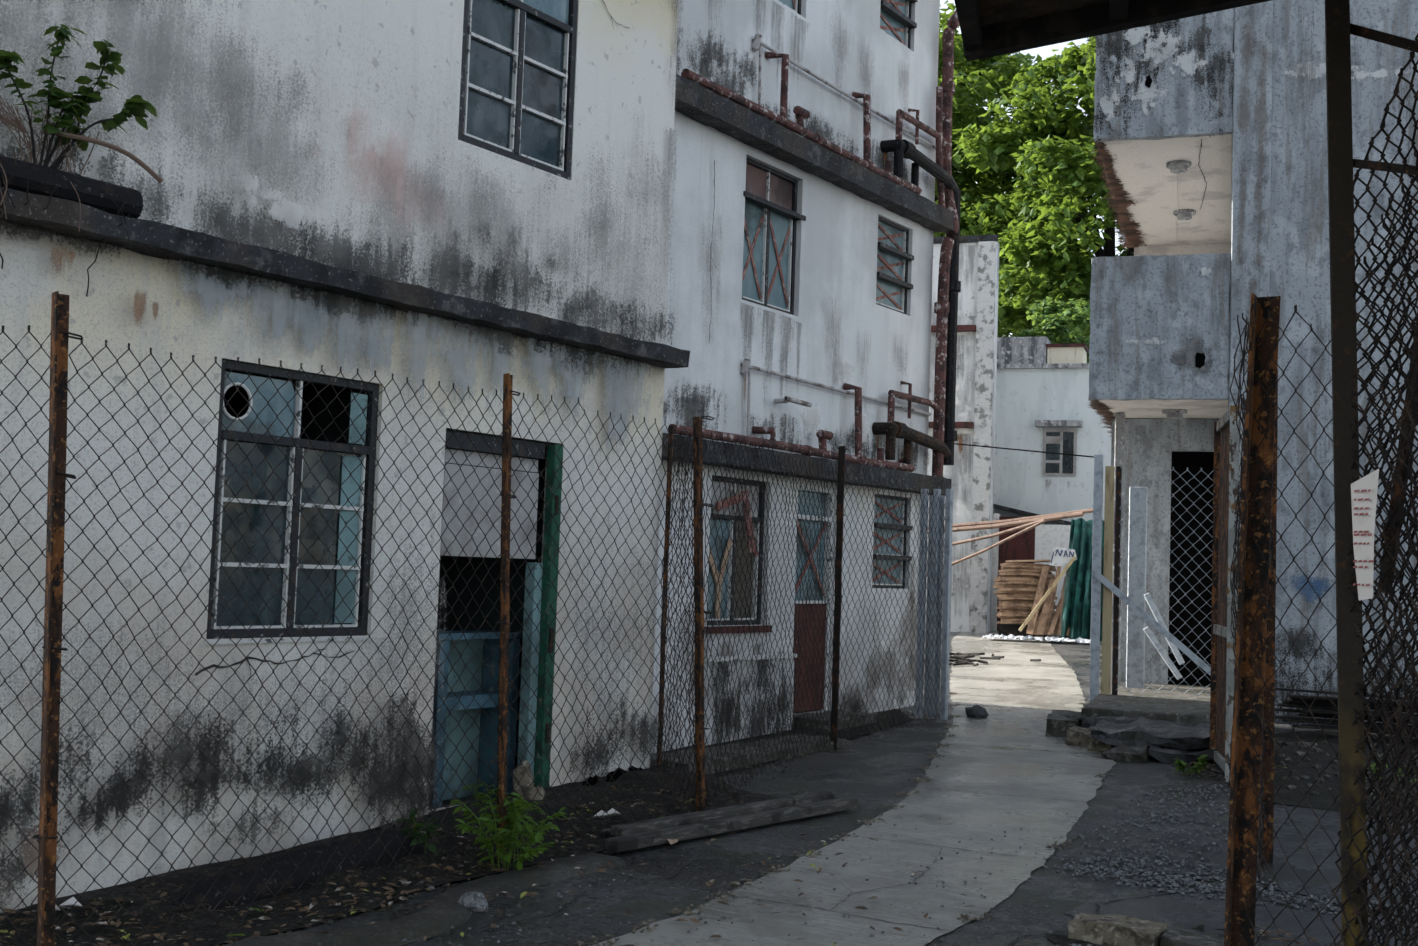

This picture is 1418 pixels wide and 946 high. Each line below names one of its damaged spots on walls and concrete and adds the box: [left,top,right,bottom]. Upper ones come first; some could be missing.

water stain [676,29,756,97]
water stain [763,104,929,180]
water stain [681,608,796,746]
water stain [0,757,41,916]
water stain [58,690,439,846]